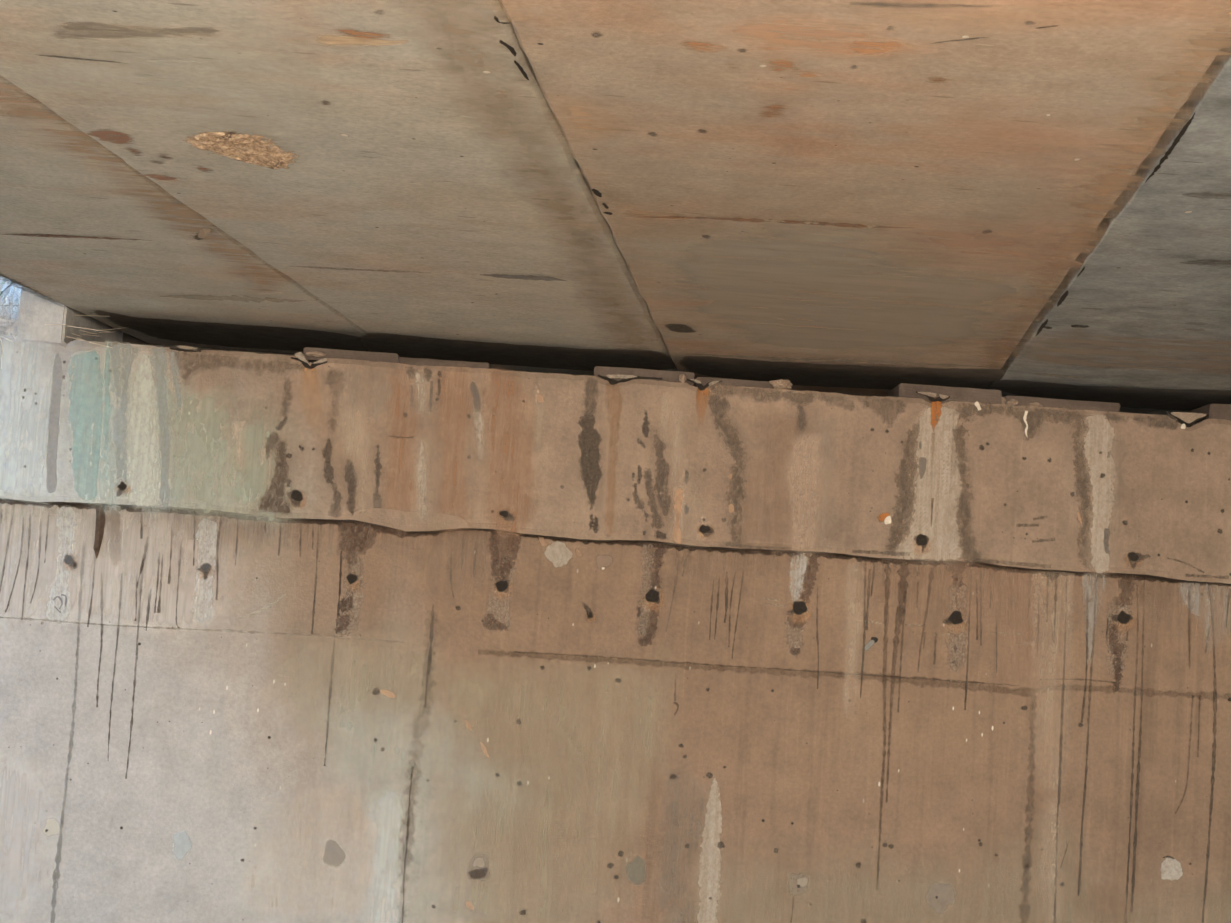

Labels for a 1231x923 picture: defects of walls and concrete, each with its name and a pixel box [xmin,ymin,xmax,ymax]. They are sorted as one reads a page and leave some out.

spalling [184,131,296,169]
corrosion [930,401,942,431]
water stain [95,274,1231,923]